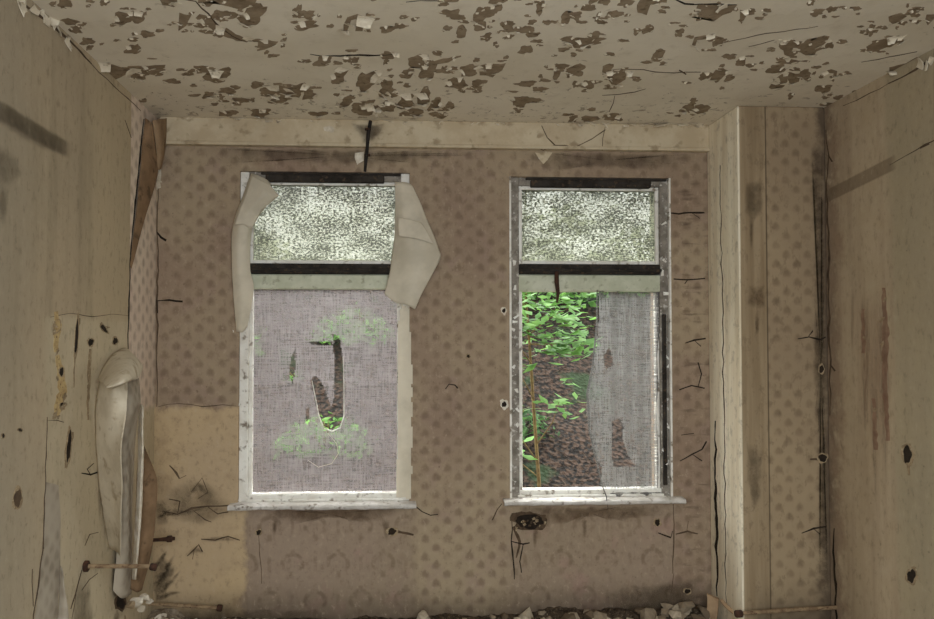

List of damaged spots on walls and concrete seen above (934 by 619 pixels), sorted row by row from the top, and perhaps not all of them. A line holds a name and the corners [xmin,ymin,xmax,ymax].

peeling [807,0,934,55]
peeling [17,0,856,133]
peeling [885,56,934,75]